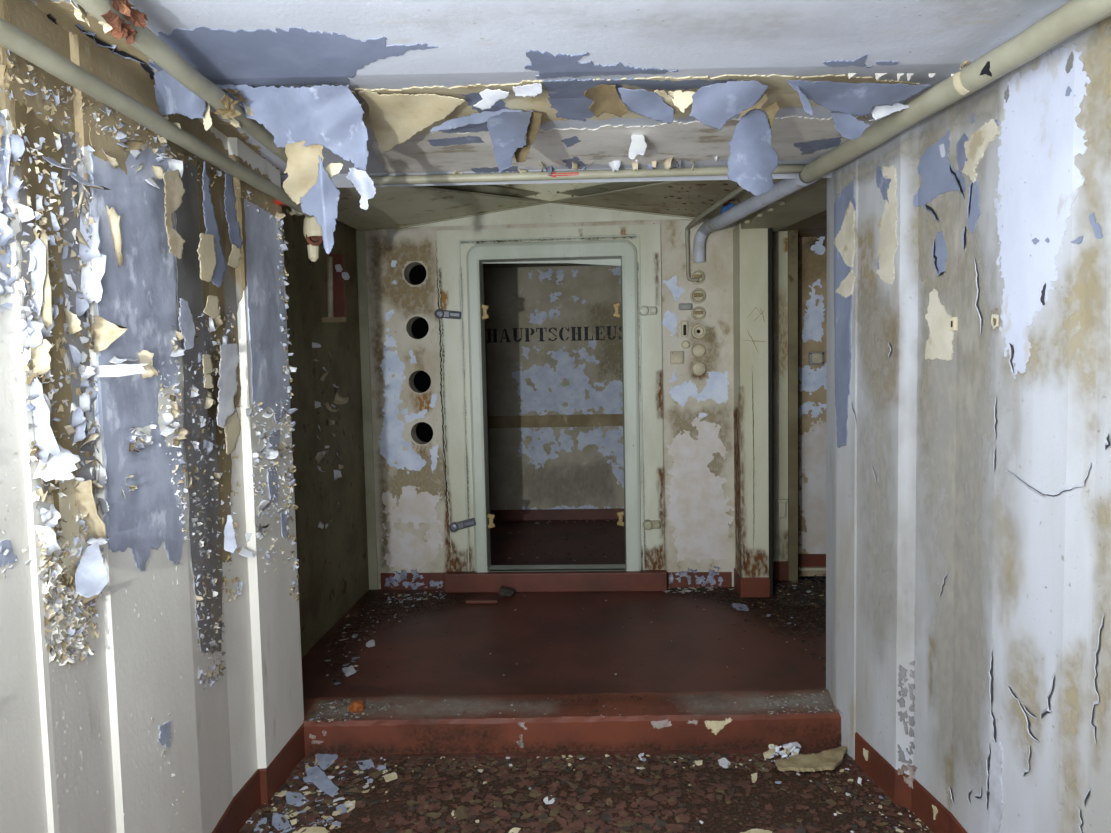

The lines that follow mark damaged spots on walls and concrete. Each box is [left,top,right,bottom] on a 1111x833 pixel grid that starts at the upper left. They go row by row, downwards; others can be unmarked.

spalling [158,26,926,176]
water stain [1079,16,1111,130]
peeling [913,43,1103,379]
peeling [0,0,300,793]
corrosion [444,462,472,572]
corrosion [641,469,665,570]
corrosion [733,395,769,577]
peeling [798,181,857,554]
water stain [1018,340,1040,374]
crack [993,396,1110,498]
water stain [1054,253,1102,388]
crack [1090,614,1104,743]